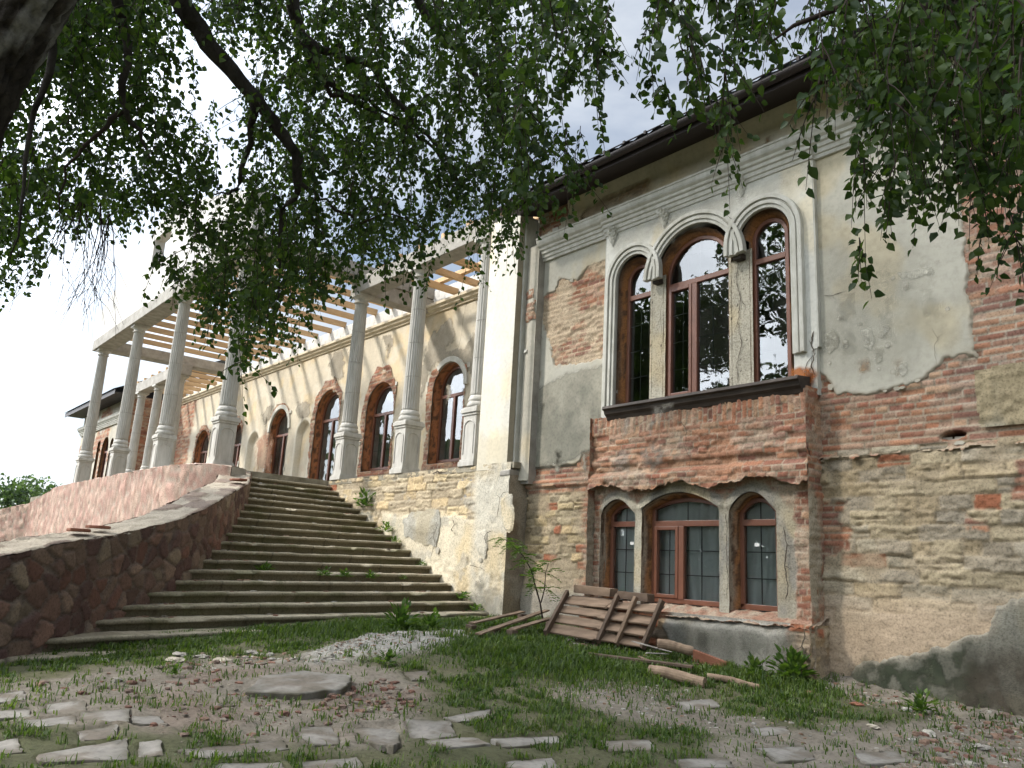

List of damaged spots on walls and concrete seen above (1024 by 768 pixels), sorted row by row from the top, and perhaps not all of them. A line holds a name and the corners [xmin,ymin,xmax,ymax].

flaking render [500,132,1024,676]
crack [782,527,790,598]
water stain [961,658,1024,716]